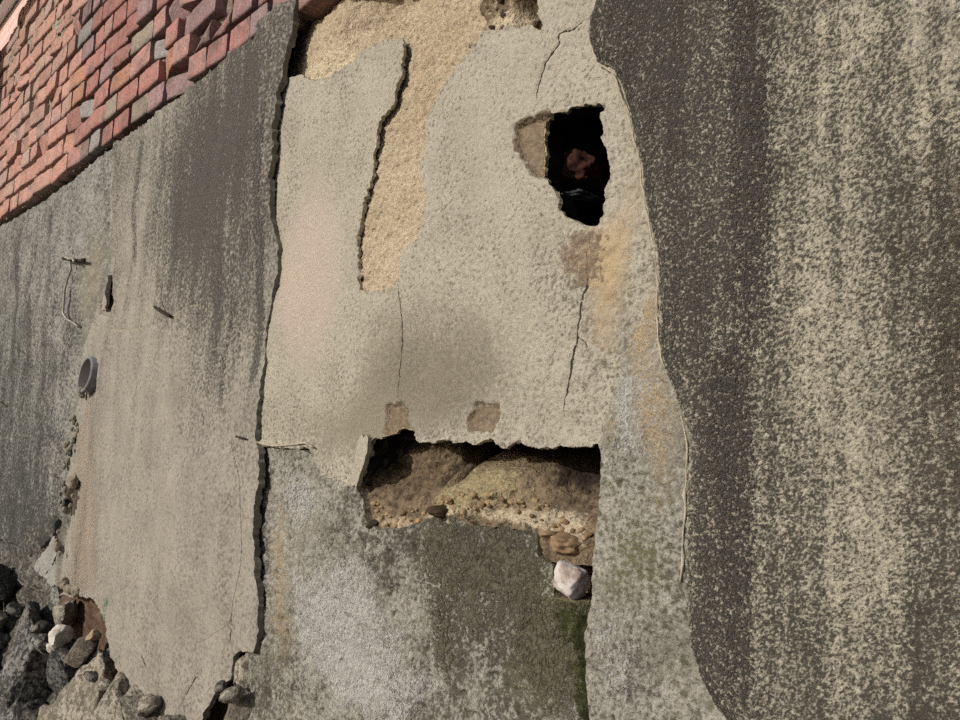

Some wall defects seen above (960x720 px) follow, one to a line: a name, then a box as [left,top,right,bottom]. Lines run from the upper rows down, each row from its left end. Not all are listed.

spalling [288,0,543,292]
spalling [513,108,551,179]
crack [536,19,585,96]
flaking render [353,401,415,487]
crack [563,237,591,410]
damp [589,0,785,720]
damp [868,143,960,524]
spalling [34,536,109,670]